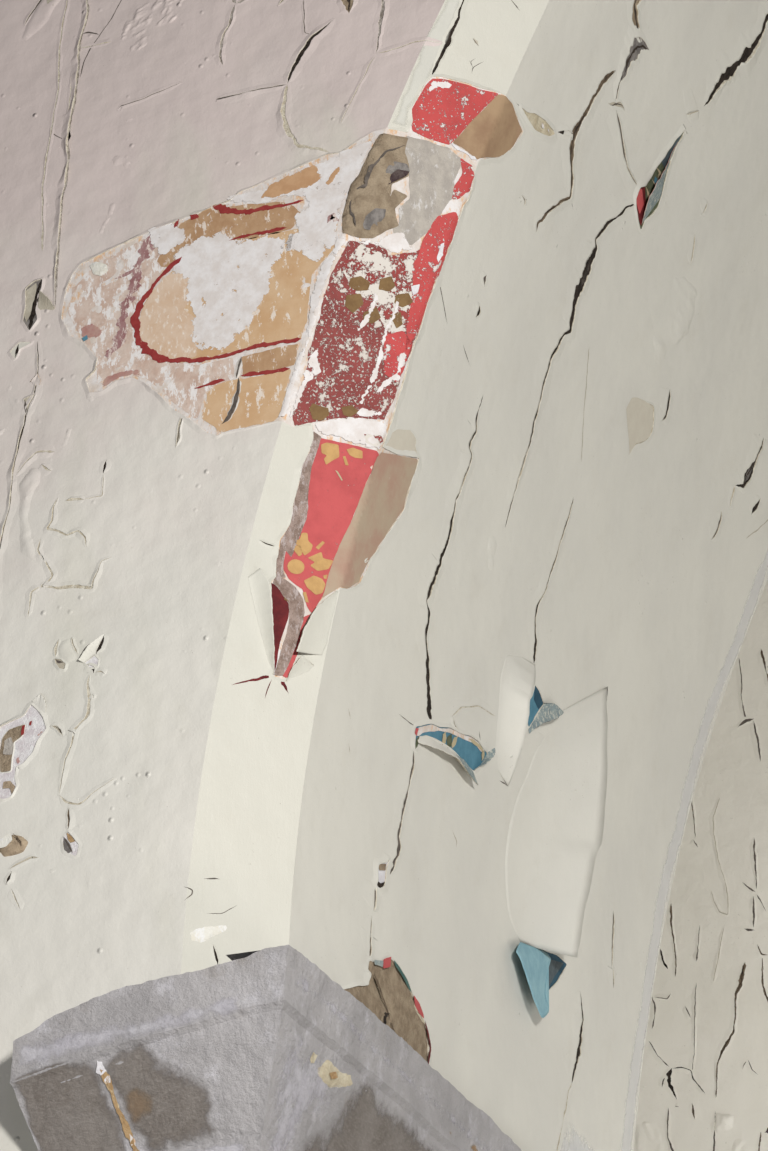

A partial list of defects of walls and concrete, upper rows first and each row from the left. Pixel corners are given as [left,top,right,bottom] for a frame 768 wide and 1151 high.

crack [214,0,480,155]
flaking render [451,94,558,161]
peeling [148,140,375,350]
crack [503,0,649,529]
flaking render [248,429,419,682]
crack [360,392,484,958]
peeling [410,655,608,1018]
water stain [16,999,236,1151]
water stain [273,1055,326,1151]
water stain [305,1086,430,1151]
flaking render [342,952,432,1067]
crack [648,788,768,1151]